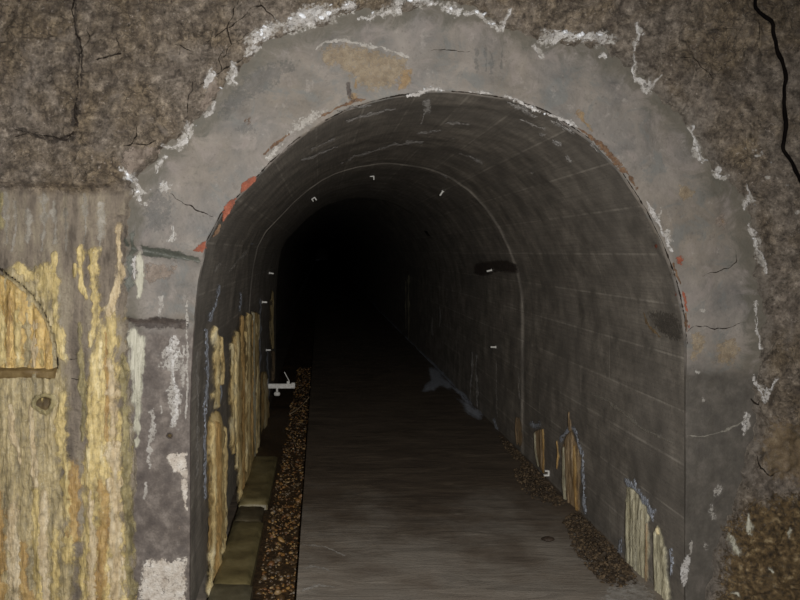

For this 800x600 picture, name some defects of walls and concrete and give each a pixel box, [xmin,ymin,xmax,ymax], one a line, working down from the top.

crack [15,0,121,141]
water stain [119,167,147,206]
crack [124,127,156,146]
crack [172,194,240,241]
corrosion [193,176,256,252]
crack [175,0,276,112]
crack [326,92,419,121]
crack [452,91,589,138]
crack [623,174,739,343]
water stain [0,223,275,600]
water stain [556,412,587,514]
water stain [604,478,693,600]